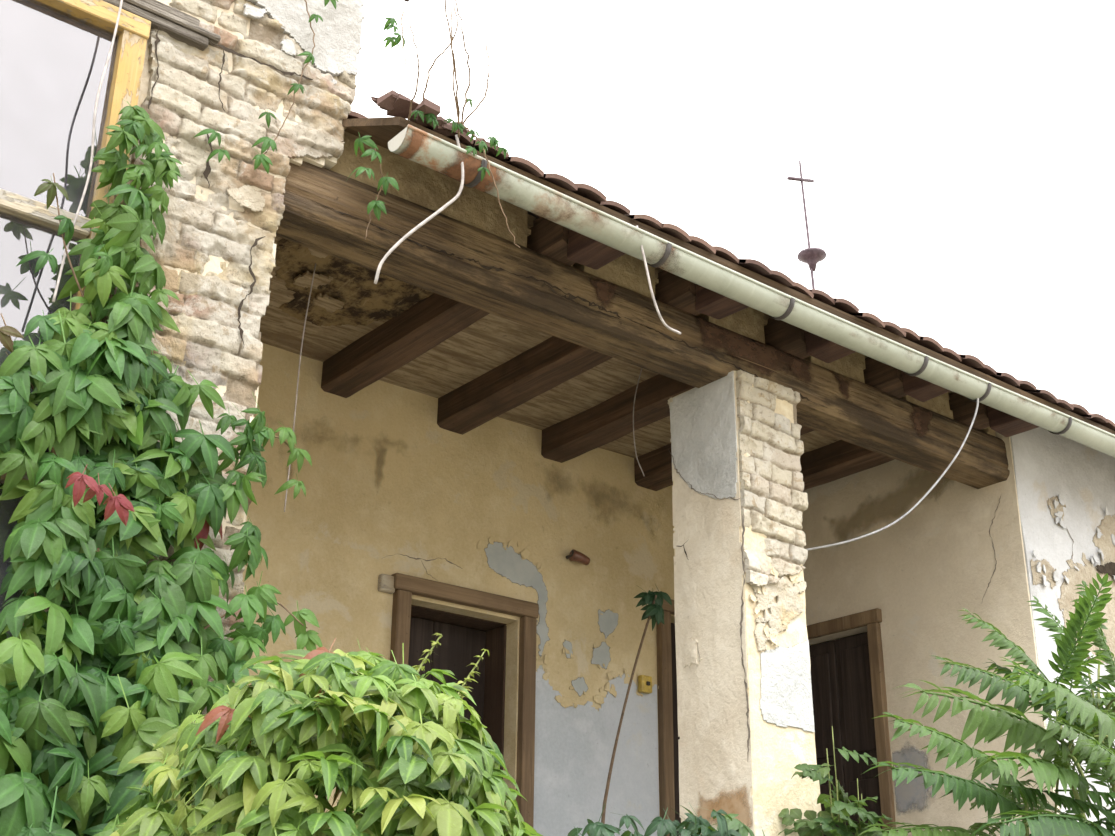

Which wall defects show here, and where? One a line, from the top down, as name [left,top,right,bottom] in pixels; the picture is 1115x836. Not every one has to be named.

crack [208,40,313,111]
crack [203,134,213,186]
rust [397,131,424,159]
rust [441,150,504,193]
flaking render [131,0,357,485]
crack [238,236,266,349]
flaking render [190,491,254,641]
crack [386,554,462,581]
flaking render [736,370,808,651]
crack [982,496,1001,602]
spalling [1030,507,1115,664]
peeling [477,537,659,836]